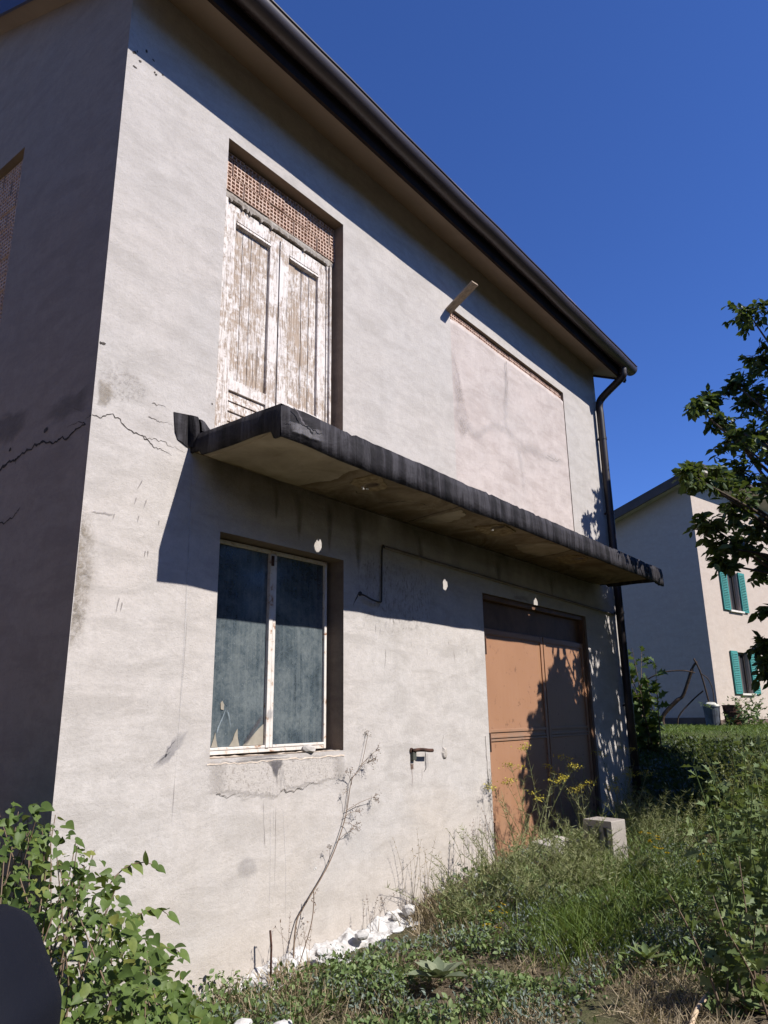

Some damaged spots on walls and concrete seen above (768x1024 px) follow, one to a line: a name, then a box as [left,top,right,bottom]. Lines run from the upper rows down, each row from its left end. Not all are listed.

crack [0,402,186,471]